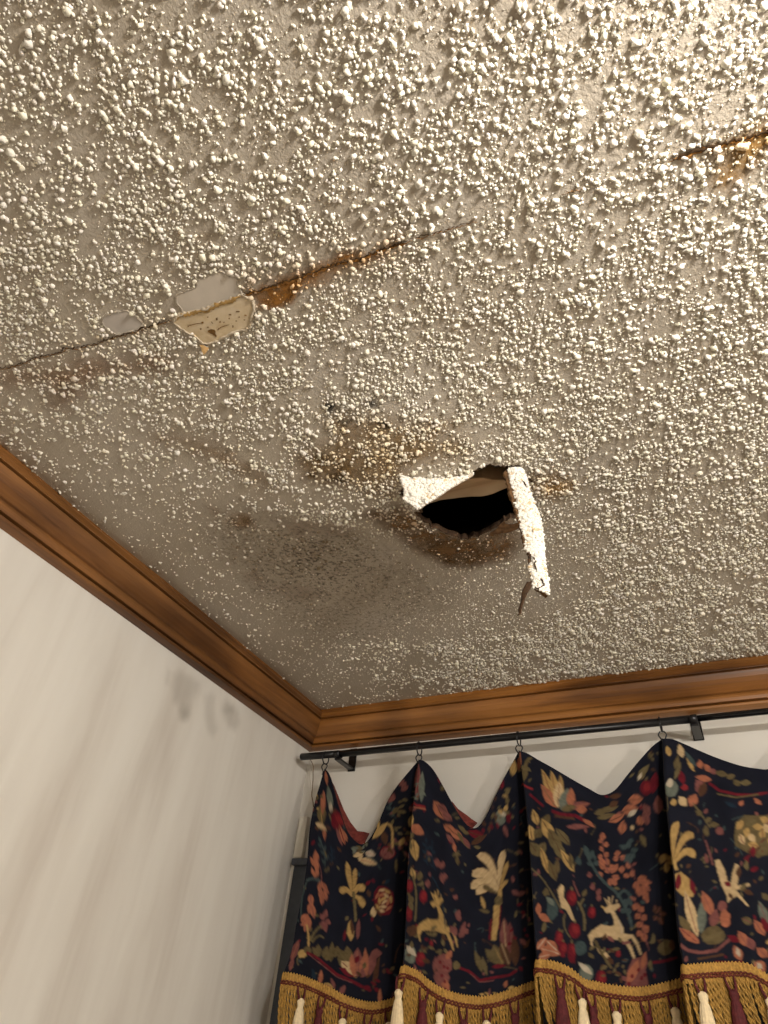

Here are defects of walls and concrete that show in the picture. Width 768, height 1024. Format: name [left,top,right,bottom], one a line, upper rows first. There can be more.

crack [667,129,768,162]
rust [731,127,768,162]
rust [255,254,365,307]
crack [242,221,476,297]
crack [0,320,171,370]
peeling [0,0,768,709]
damp [308,423,433,488]
damp [544,479,567,493]
damp [371,509,517,566]